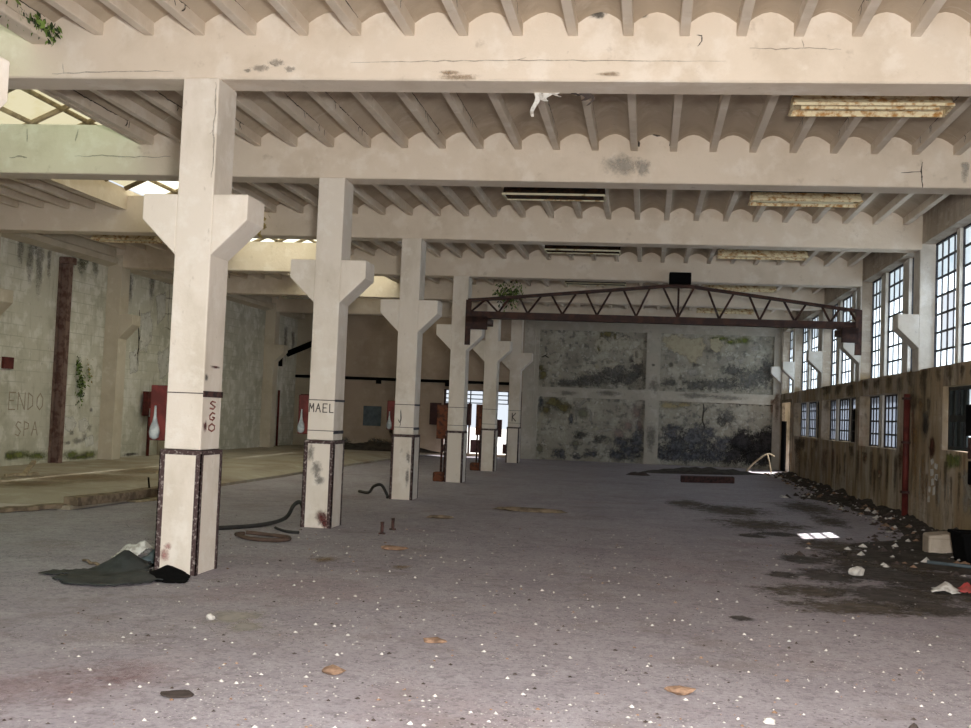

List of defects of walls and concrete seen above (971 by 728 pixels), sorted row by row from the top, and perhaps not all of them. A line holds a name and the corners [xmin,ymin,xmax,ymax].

damp [539,358,774,468]